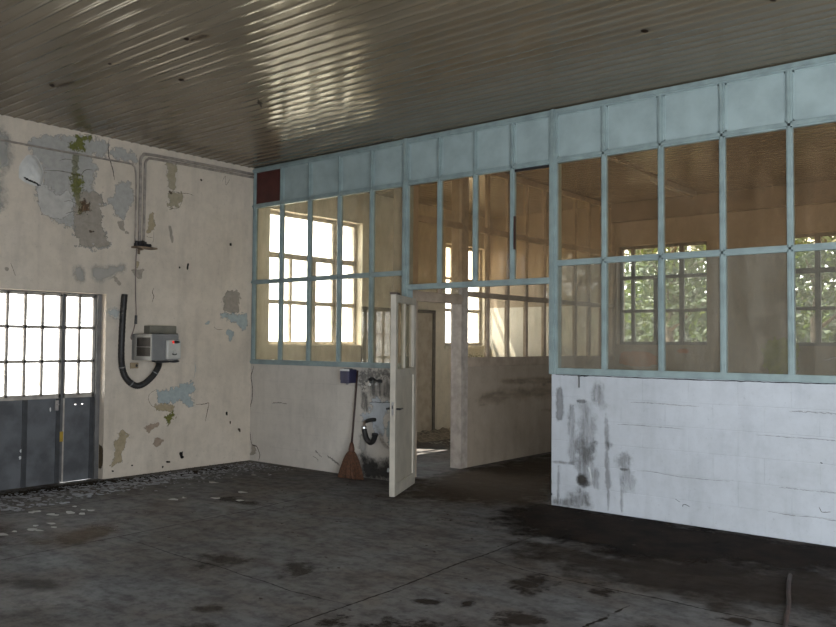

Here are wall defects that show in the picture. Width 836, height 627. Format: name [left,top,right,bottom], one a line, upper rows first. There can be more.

peeling [28,133,138,252]
peeling [165,163,192,210]
peeling [75,261,144,285]
peeling [205,290,248,341]
peeling [144,365,196,447]
leakage [359,368,390,411]
flaking render [99,430,130,472]
leakage [360,435,389,480]
leakage [554,386,610,506]
crack [3,496,797,627]